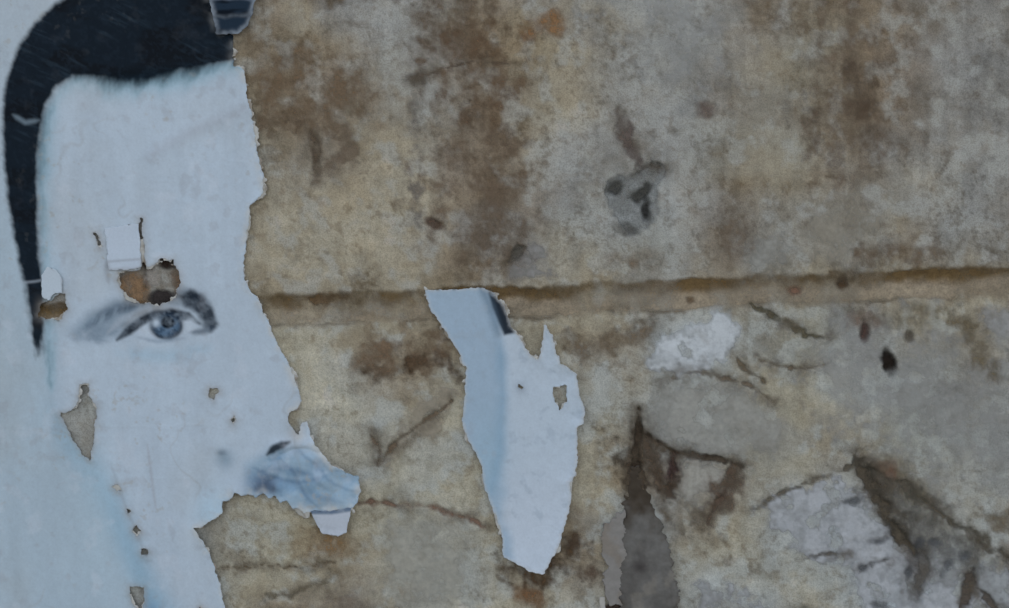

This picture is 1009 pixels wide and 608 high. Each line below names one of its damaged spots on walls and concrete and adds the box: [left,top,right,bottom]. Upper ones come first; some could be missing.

water stain [439,0,525,152]
spalling [309,129,358,175]
spalling [605,115,665,235]
spalling [120,259,181,306]
spalling [309,293,347,305]
crack [671,357,824,401]
crack [750,303,823,338]
crack [631,407,744,525]
peeling [599,466,680,608]
crack [757,455,1009,608]
peeling [767,476,1009,608]